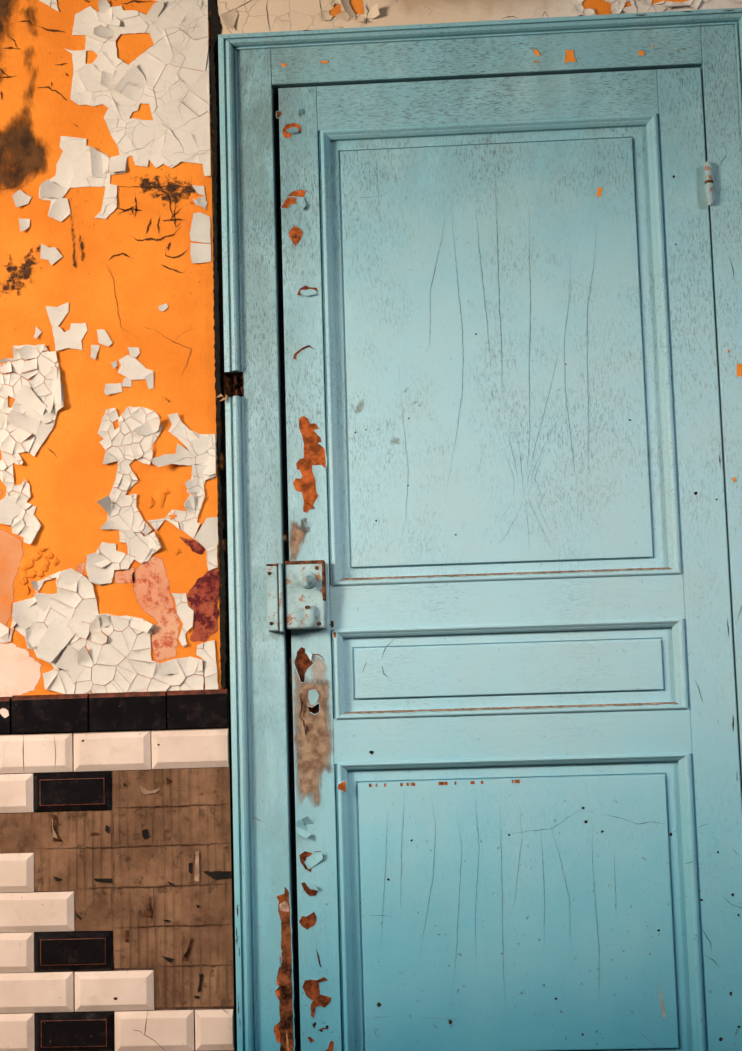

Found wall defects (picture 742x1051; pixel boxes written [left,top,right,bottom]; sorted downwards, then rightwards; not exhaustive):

leakage [0,0,13,40]
leakage [0,74,47,188]
peeling [12,0,211,266]
peeling [0,302,220,718]
peeling [292,415,327,514]
crack [429,176,502,501]
crack [500,231,597,554]
peeling [293,646,314,683]
peeling [0,767,234,1008]
peeling [273,850,335,1051]
crack [373,790,405,939]
crack [419,793,662,1020]